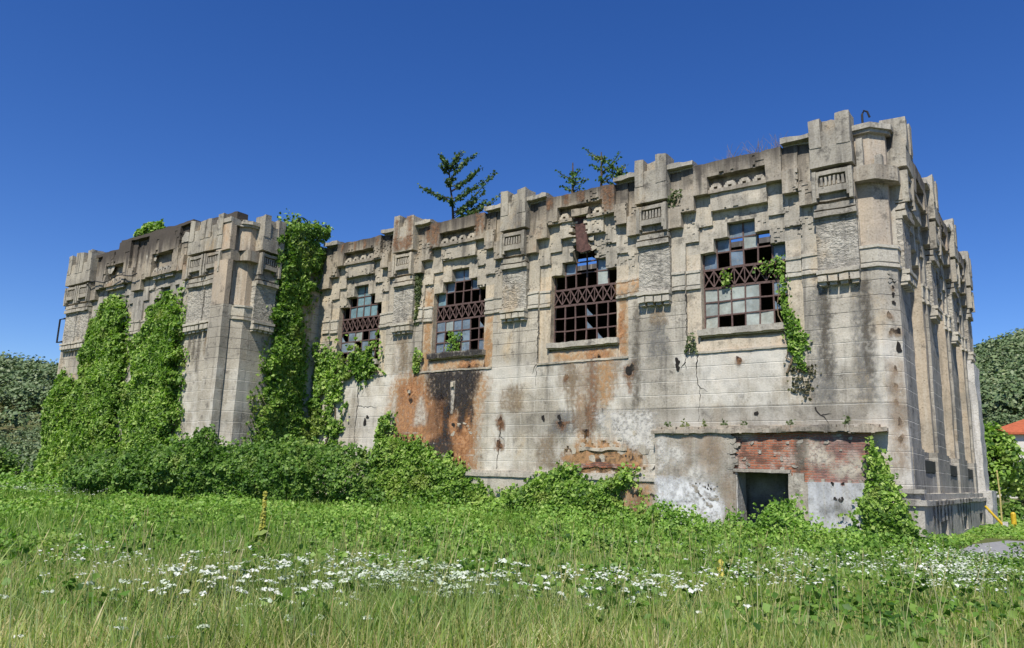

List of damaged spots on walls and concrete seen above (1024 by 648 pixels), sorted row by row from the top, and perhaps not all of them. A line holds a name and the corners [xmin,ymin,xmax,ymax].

rust [386,318,493,468]
rust [554,278,639,436]
peeling [562,410,725,526]
crack [681,293,708,413]
flaking render [725,433,762,470]
flaking render [774,434,863,520]
damp [817,288,834,401]
damp [856,281,876,399]